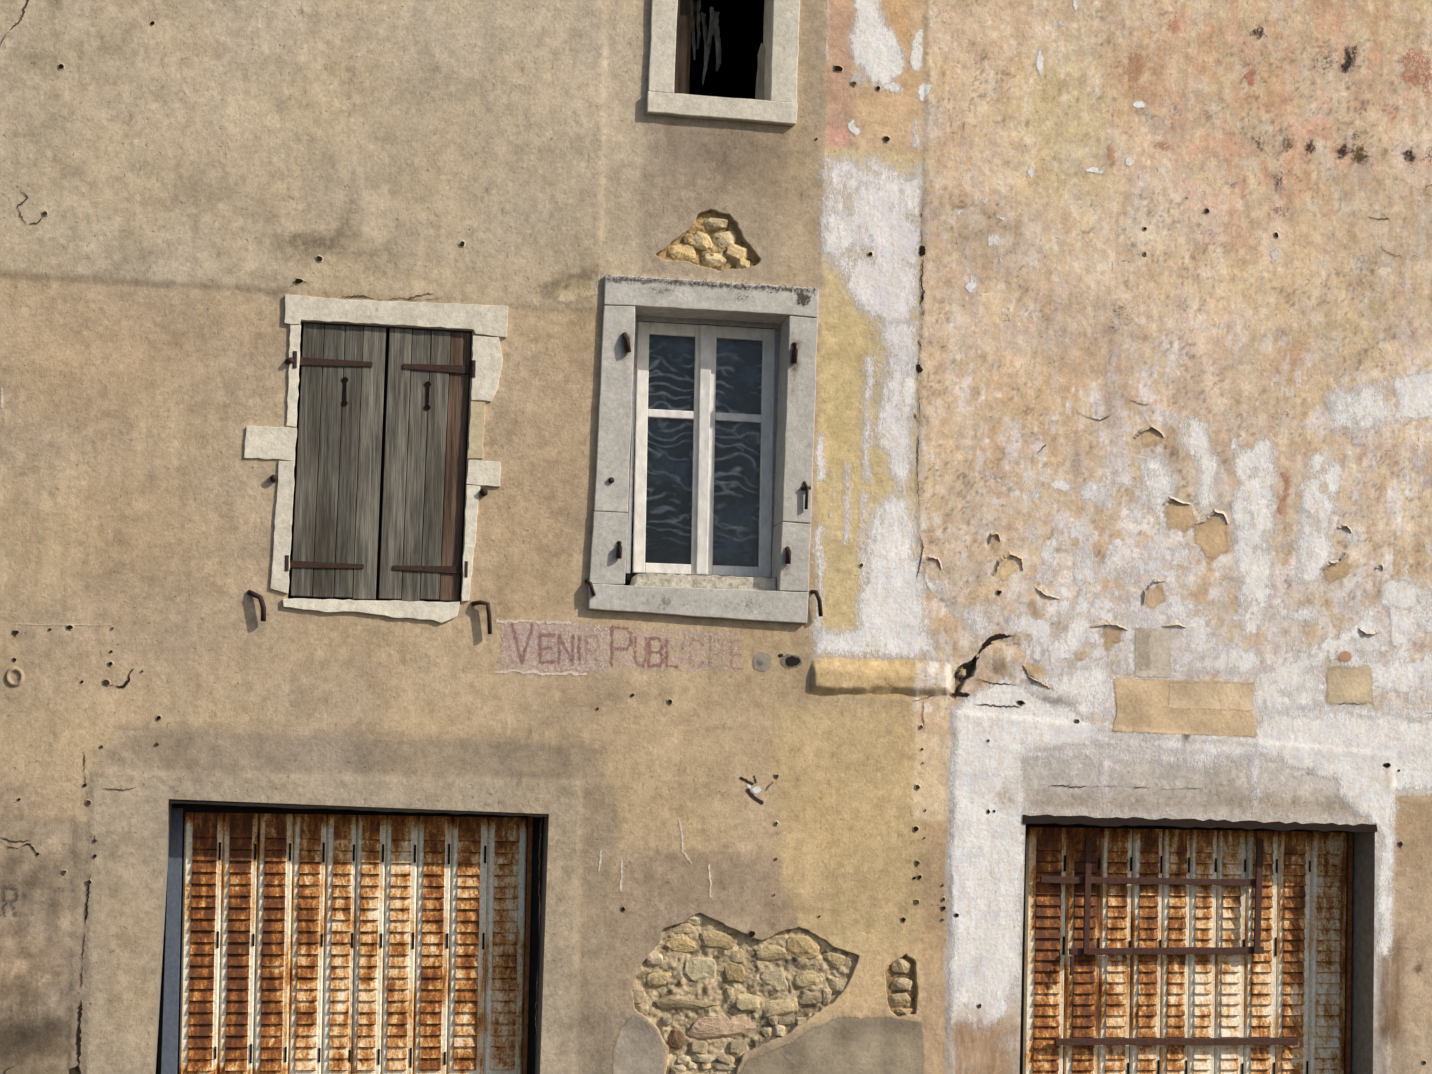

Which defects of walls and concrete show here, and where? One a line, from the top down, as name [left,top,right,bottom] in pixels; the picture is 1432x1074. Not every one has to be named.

crack [0,0,29,45]
peeling [1036,48,1044,77]
crack [17,191,43,225]
flaking render [656,211,759,271]
peeling [810,119,1432,1066]
crack [913,633,1054,727]
flaking render [631,913,857,1074]